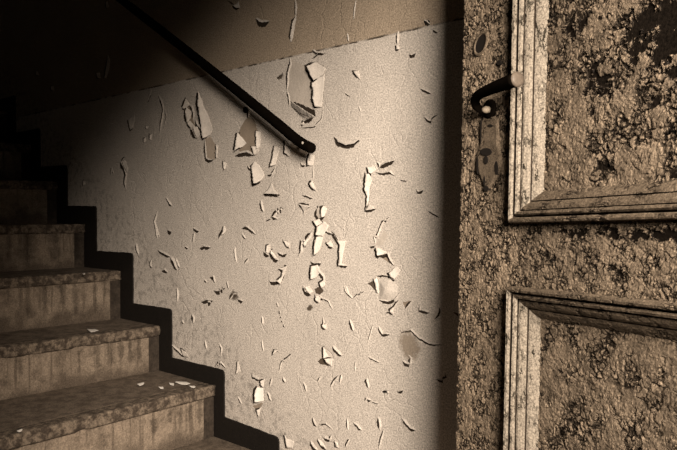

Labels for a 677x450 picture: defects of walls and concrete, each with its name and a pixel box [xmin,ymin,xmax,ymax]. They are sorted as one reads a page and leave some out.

peeling [288,50,325,128]
peeling [181,92,227,170]
peeling [233,107,317,192]
peeling [263,239,290,286]
peeling [298,203,348,309]
peeling [368,217,401,295]
peeling [386,300,411,316]
peeling [251,373,265,417]
peeling [318,345,333,367]
peeling [310,436,339,450]